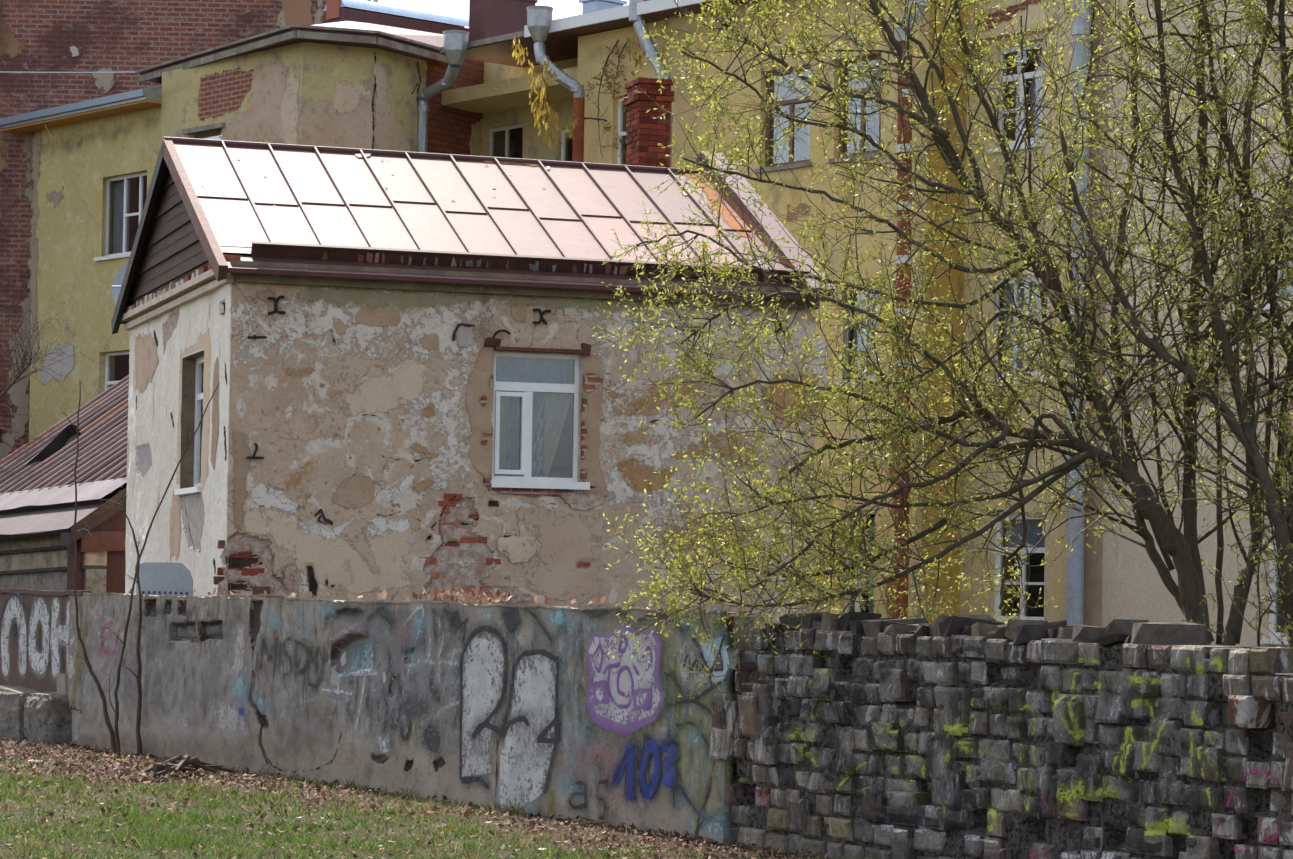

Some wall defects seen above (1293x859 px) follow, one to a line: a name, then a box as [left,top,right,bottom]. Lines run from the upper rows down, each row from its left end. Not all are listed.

spalling [330,631,374,676]
spalling [735,661,766,692]
spalling [248,671,269,765]